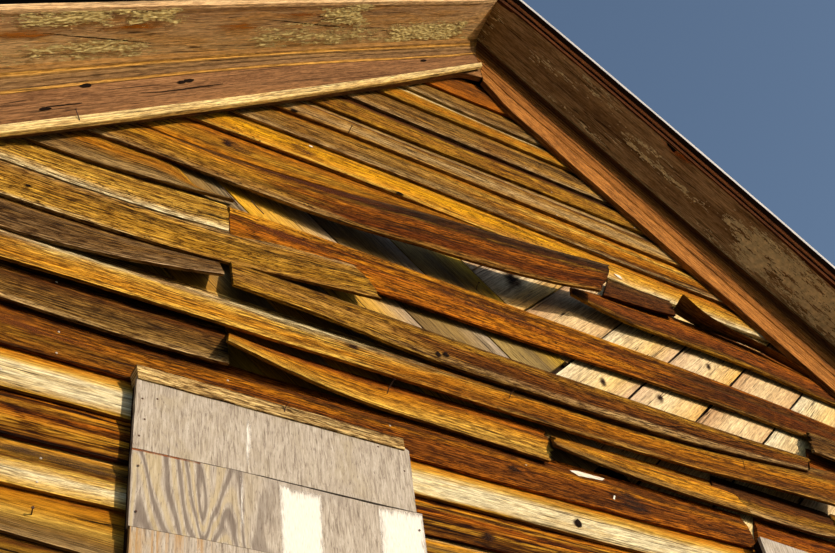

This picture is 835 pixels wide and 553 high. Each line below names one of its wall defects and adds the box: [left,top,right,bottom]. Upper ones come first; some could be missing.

peeling [549,96,710,212]
peeling [697,209,835,344]